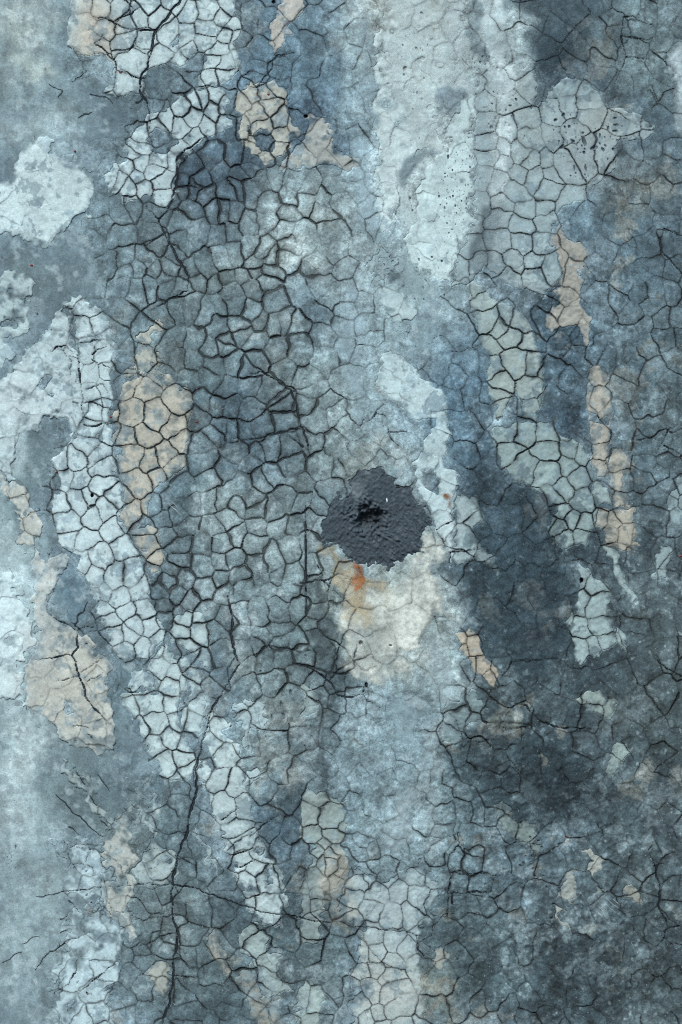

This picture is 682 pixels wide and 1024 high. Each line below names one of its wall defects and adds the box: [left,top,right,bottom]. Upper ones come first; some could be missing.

crack [97,0,182,129]
crack [616,16,669,80]
crack [146,137,205,307]
crack [659,228,682,274]
crack [54,339,114,427]
crack [234,371,311,457]
crack [300,566,351,603]
rust [330,547,385,619]
crack [456,704,584,774]
crack [2,602,494,1023]
crack [642,845,682,954]